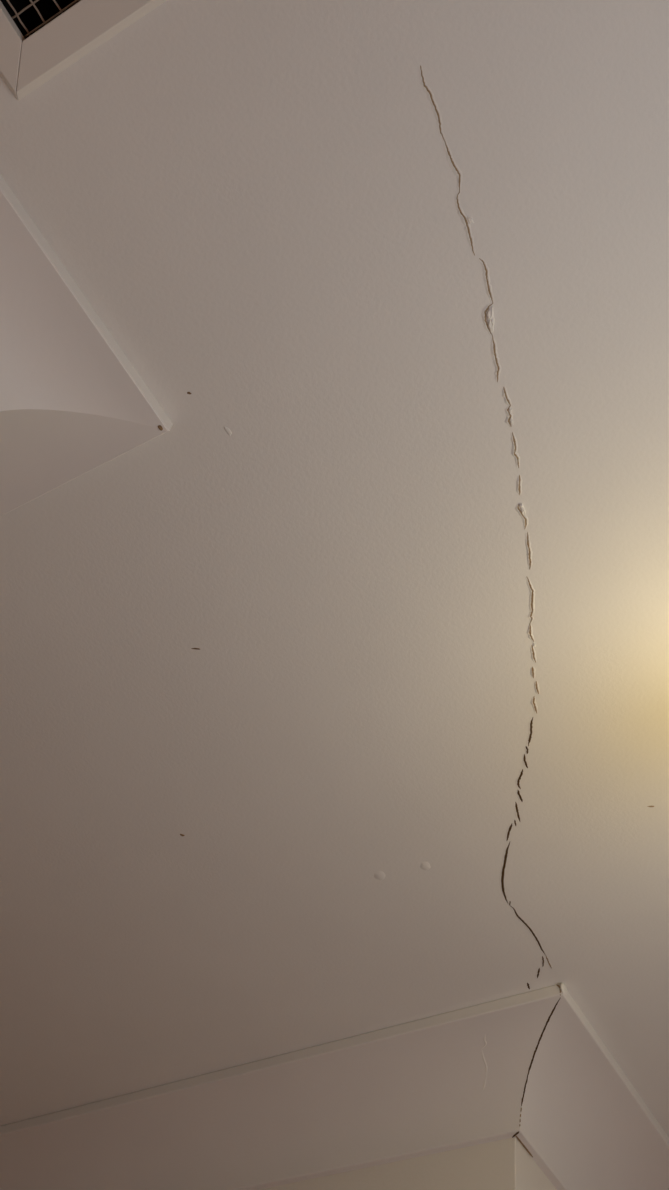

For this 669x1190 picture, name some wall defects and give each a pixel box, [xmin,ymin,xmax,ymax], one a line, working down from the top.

crack [418,66,561,1157]